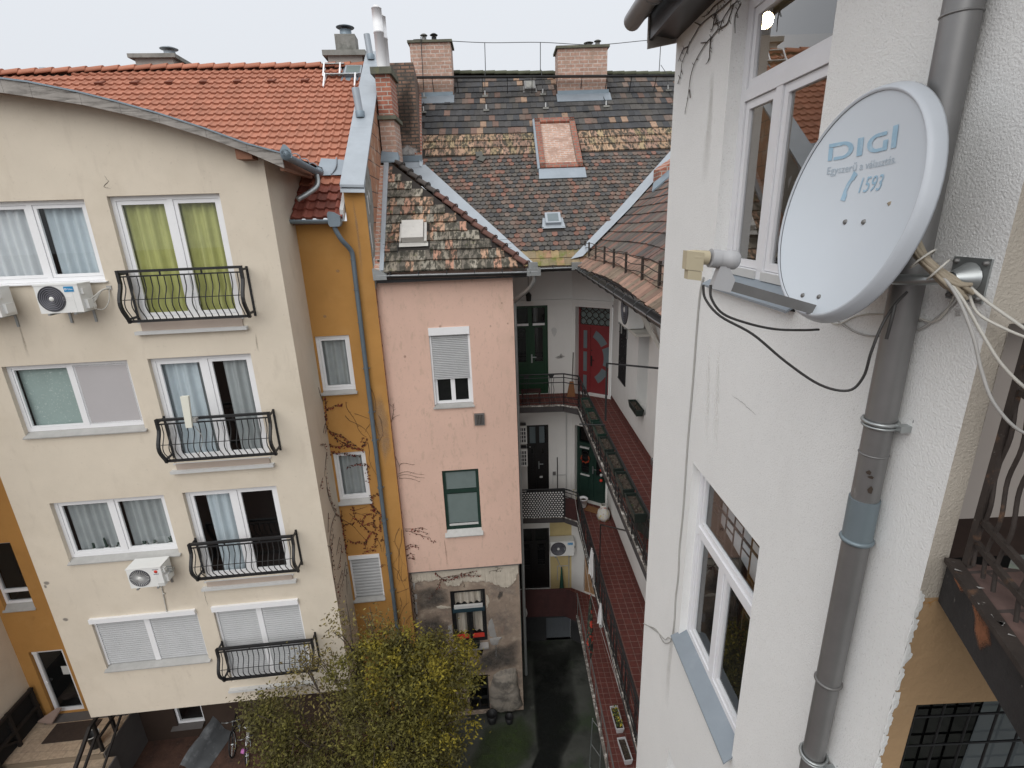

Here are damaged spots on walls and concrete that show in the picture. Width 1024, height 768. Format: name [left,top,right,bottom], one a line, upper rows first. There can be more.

damp [420,589,444,608]
peeling [412,565,518,655]
rust [973,605,989,645]
damp [479,645,515,669]
peeling [874,591,925,768]